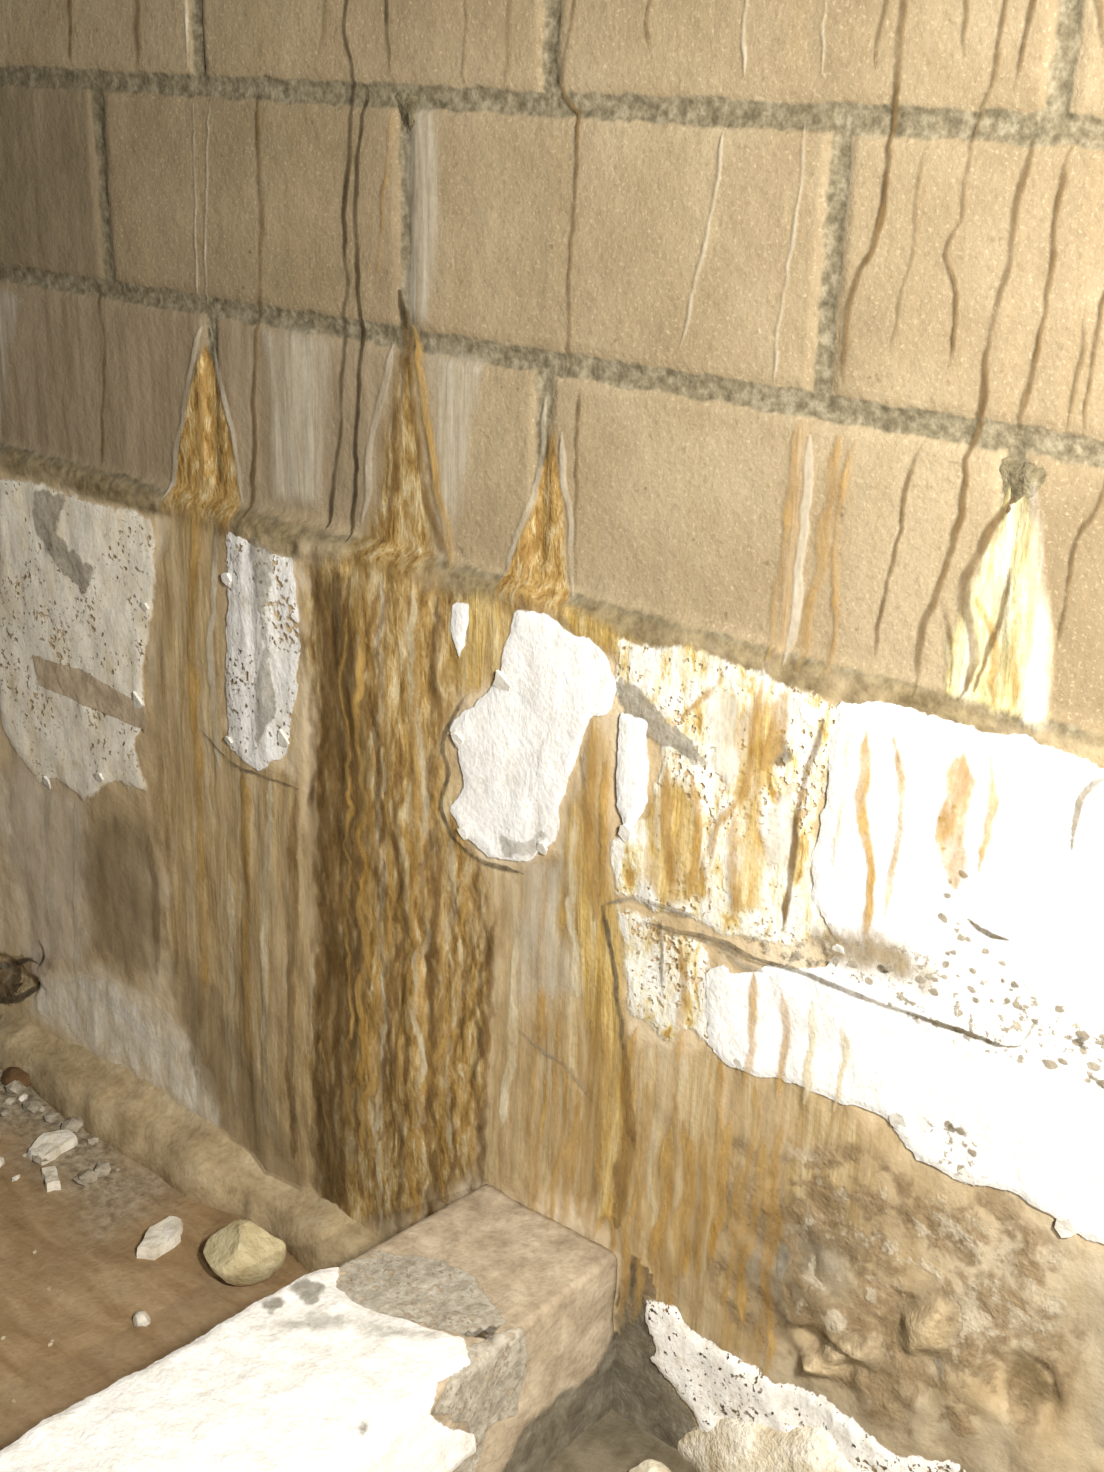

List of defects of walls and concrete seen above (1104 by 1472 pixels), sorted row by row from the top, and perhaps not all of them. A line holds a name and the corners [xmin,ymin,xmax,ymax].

water stain [1012,177,1026,240]
water stain [1072,297,1104,414]
water stain [917,349,1067,723]
water stain [1069,493,1104,586]
peeling [0,479,156,801]
peeling [221,532,301,771]
corrosion [156,289,880,1355]
crack [602,899,872,1049]
peeling [450,602,1104,1472]
crack [907,1011,1038,1047]
crack [968,918,1009,940]